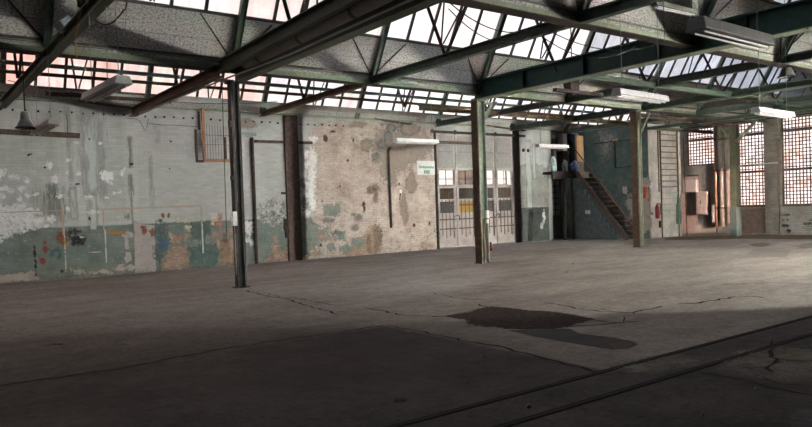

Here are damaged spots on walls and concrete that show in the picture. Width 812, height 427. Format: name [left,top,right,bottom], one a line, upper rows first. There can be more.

peeling [0,167,56,243]
peeling [100,168,127,199]
peeling [245,197,288,263]
peeling [299,118,437,260]
crack [246,290,340,314]
crack [363,286,594,372]
crack [549,282,796,327]
crack [701,340,812,395]